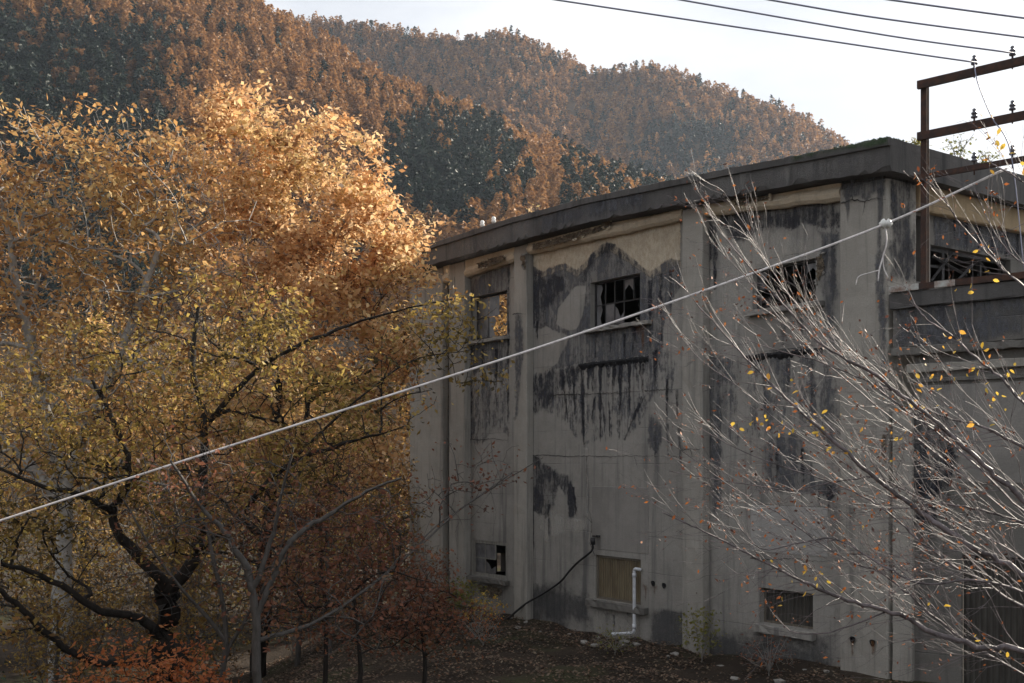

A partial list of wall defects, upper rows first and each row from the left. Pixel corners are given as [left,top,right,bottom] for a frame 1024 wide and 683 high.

damp [470,242,681,463]
damp [709,176,1024,395]
damp [533,456,585,545]